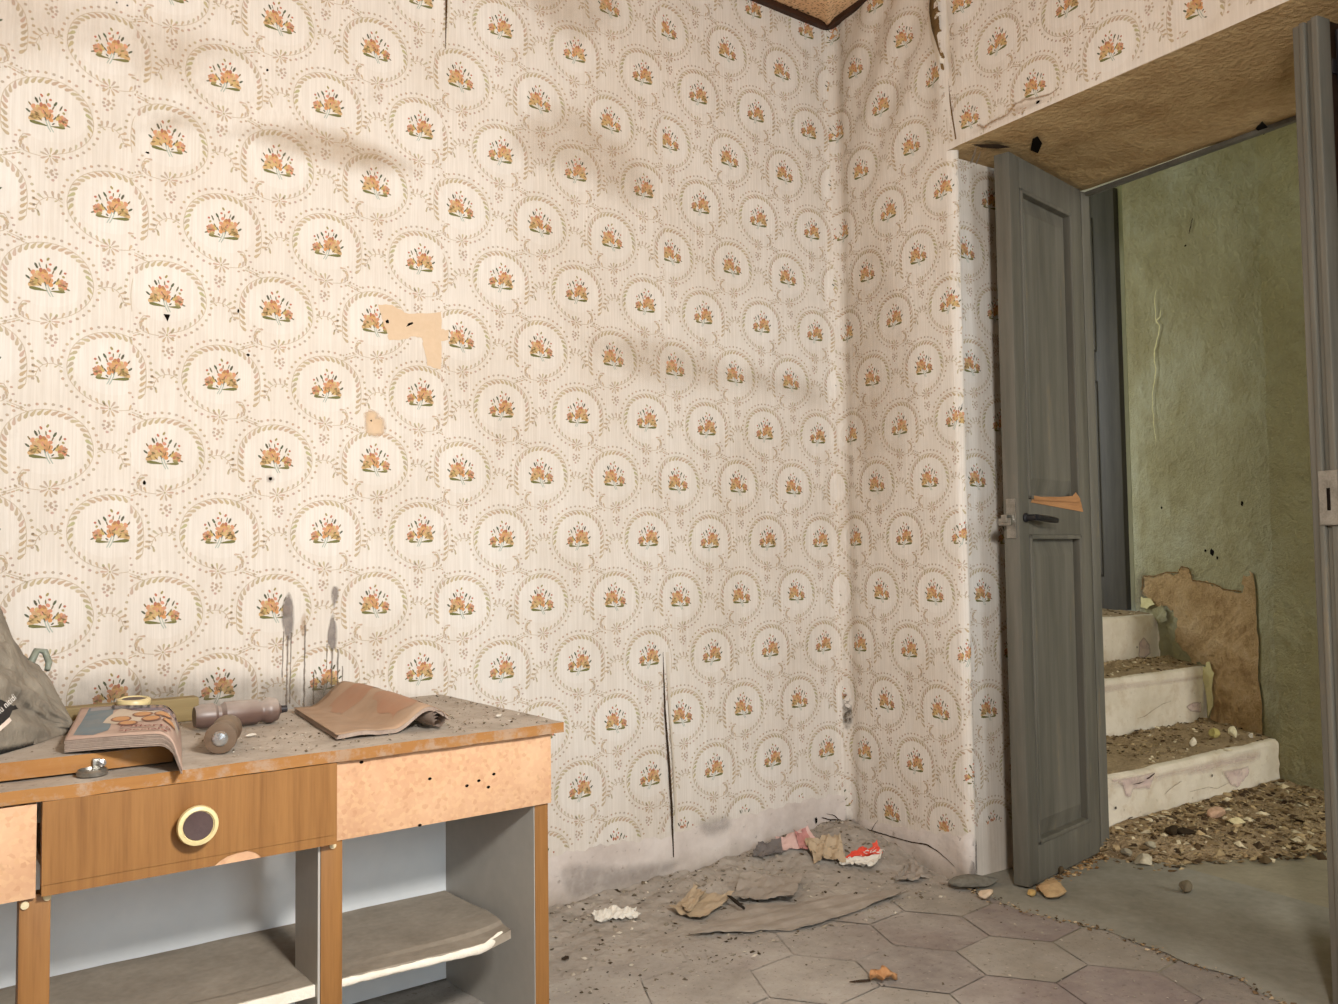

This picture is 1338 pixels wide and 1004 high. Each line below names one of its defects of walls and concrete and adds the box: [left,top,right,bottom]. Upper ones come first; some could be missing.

peeling [378,304,449,370]
peeling [366,411,384,435]
spalling [1139,566,1262,738]